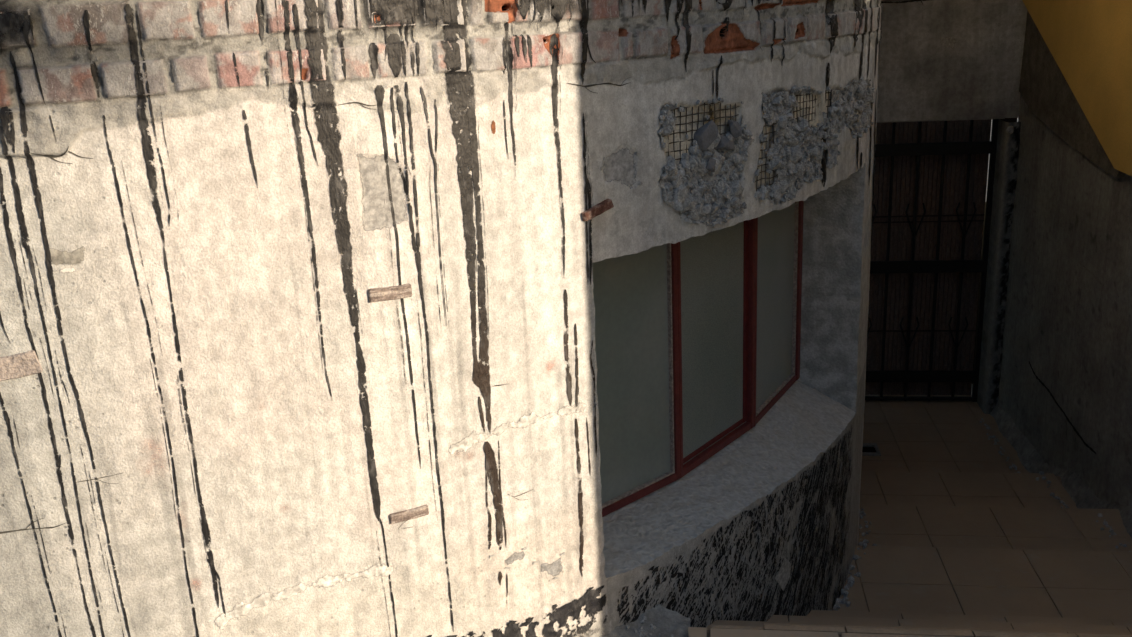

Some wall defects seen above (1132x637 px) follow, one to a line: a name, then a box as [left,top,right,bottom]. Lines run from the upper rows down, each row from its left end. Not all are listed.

spalling [485,0,518,23]
spalling [543,34,560,59]
spalling [704,22,760,54]
spalling [754,0,818,10]
crack [31,146,93,164]
water stain [503,0,596,285]
spalling [658,77,875,227]
water stain [0,3,131,637]
water stain [103,4,226,637]
water stain [256,0,507,637]
water stain [564,289,597,577]
crack [0,518,65,534]